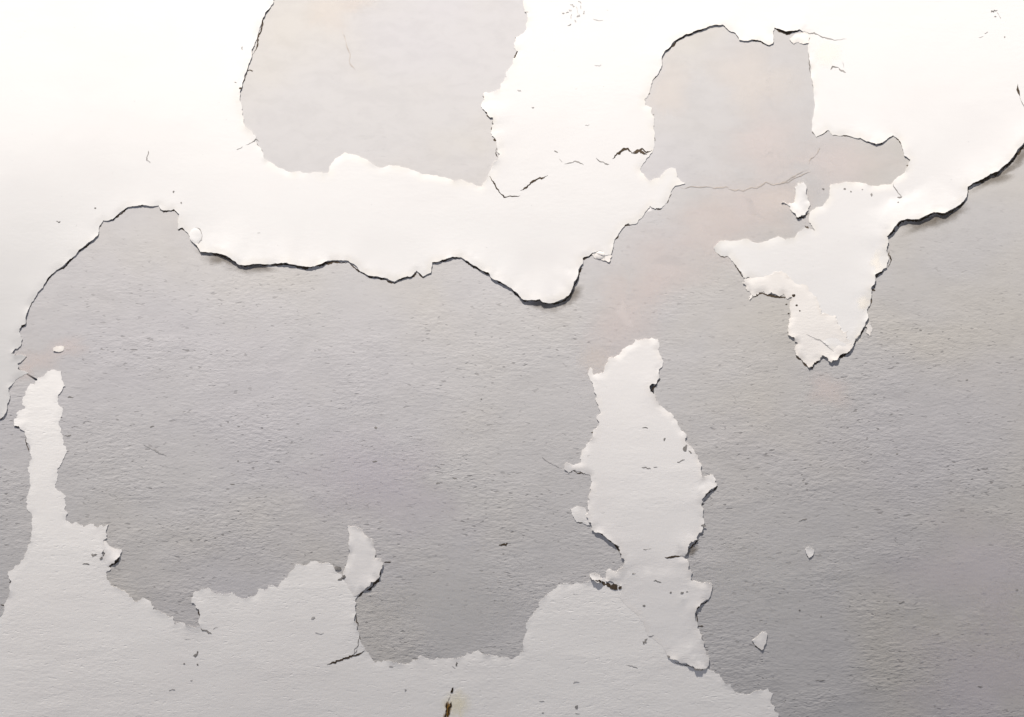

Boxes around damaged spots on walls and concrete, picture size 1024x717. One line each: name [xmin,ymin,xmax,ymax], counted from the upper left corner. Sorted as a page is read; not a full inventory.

peeling [235,0,528,186]
peeling [0,374,36,617]
peeling [12,205,638,665]
peeling [601,25,1024,717]